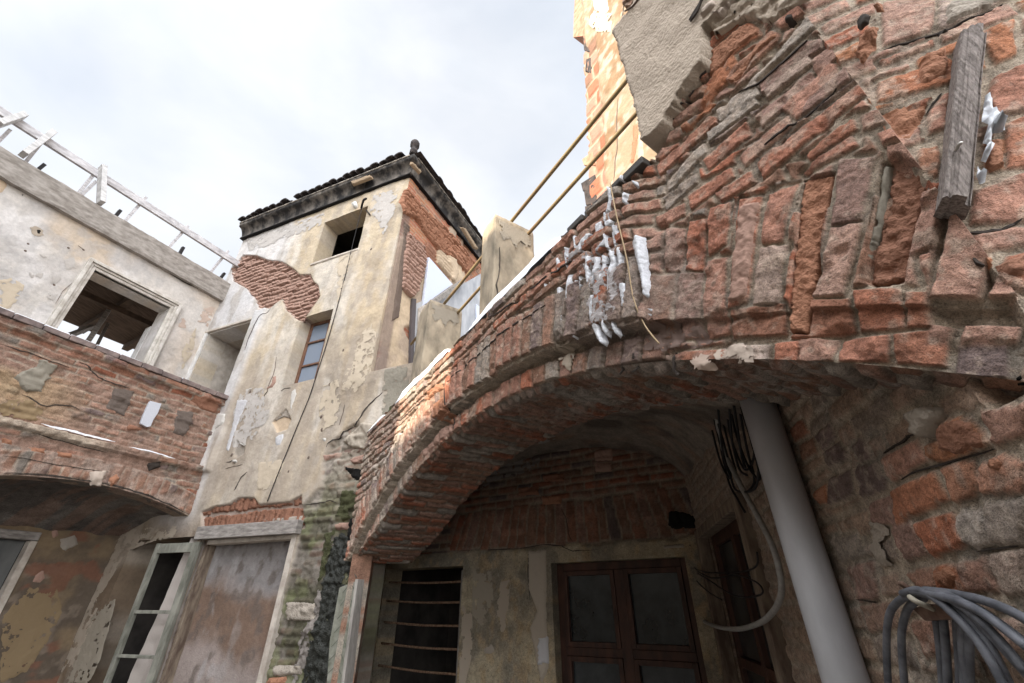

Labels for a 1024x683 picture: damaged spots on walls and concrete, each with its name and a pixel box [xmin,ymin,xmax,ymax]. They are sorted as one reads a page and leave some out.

peeling [231,255,320,323]
peeling [398,189,479,298]
damp [541,175,754,364]
crack [2,344,128,388]
crack [401,247,592,431]
crack [14,395,78,410]
peeling [272,389,296,445]
crack [326,392,383,447]
crack [883,434,914,454]
crack [901,449,994,480]
peeling [202,497,305,526]